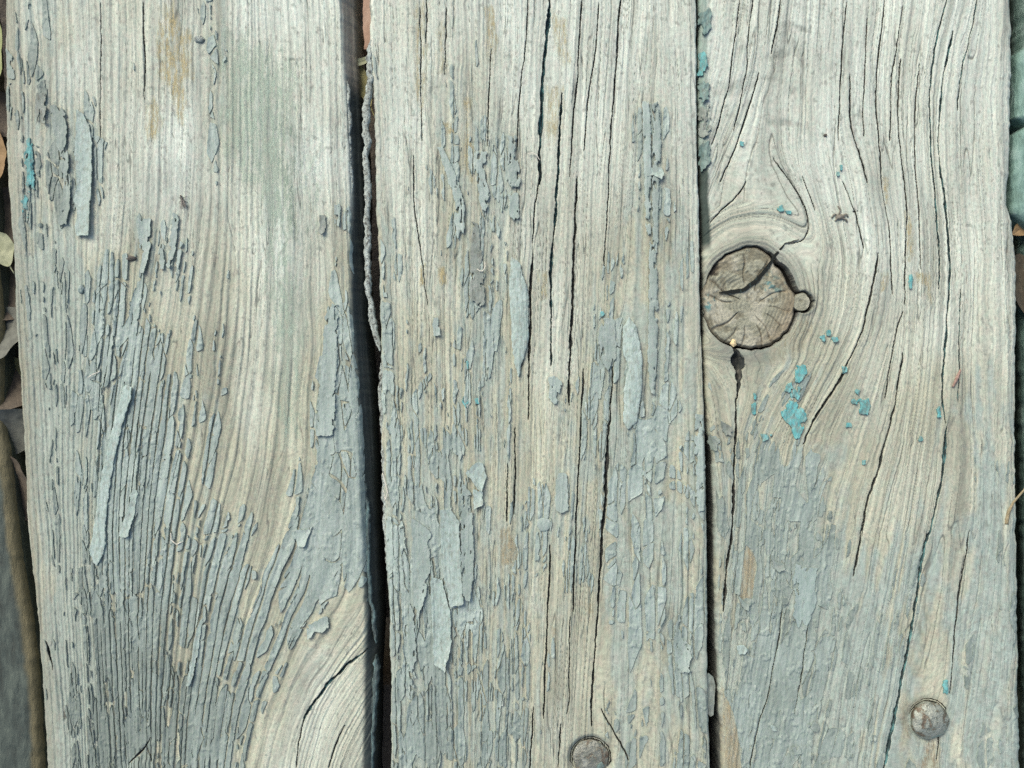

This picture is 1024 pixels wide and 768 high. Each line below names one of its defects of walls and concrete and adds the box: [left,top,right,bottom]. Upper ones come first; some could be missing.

crack [419,1,447,130]
crack [712,0,781,217]
crack [719,158,815,313]
peeling [6,0,368,768]
crack [506,0,628,767]
peeling [380,51,926,768]
crack [723,343,768,611]
crack [803,0,977,768]
crack [296,649,367,766]
peeling [952,634,975,694]
peeling [976,724,1002,768]
peeling [999,594,1017,632]